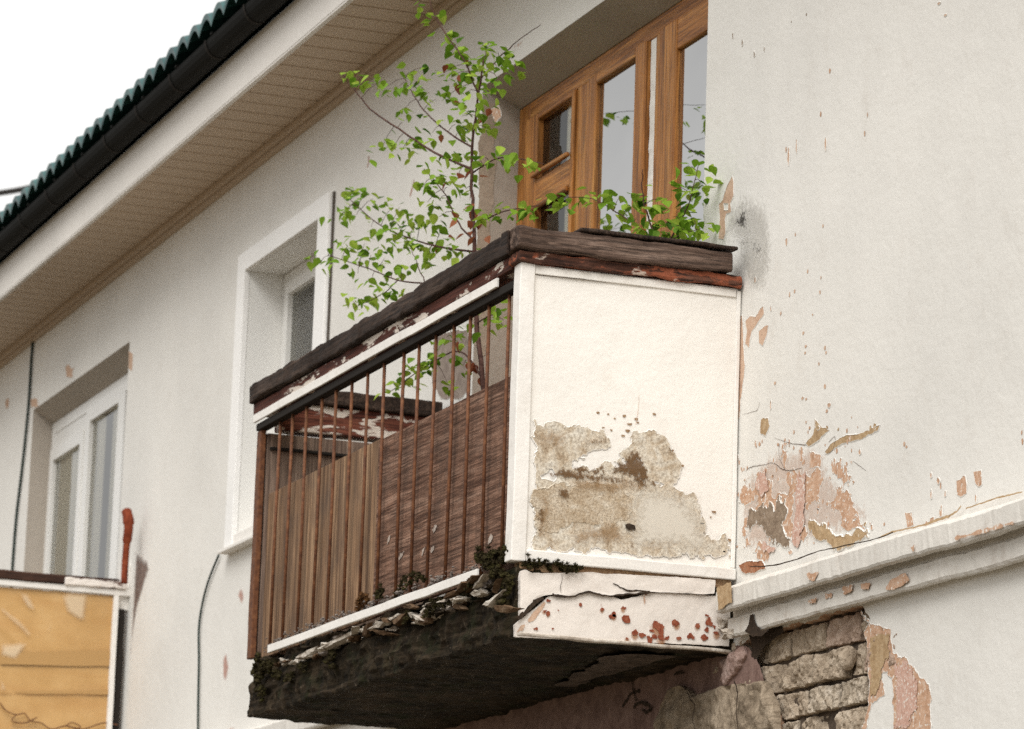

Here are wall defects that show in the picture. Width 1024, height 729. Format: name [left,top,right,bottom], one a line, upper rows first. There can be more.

peeling [718,175,734,240]
peeling [738,305,781,419]
crack [746,420,881,471]
peeling [727,399,885,575]
crack [750,492,1022,567]
peeling [905,469,982,528]
crack [517,581,711,620]
spalling [717,582,932,729]